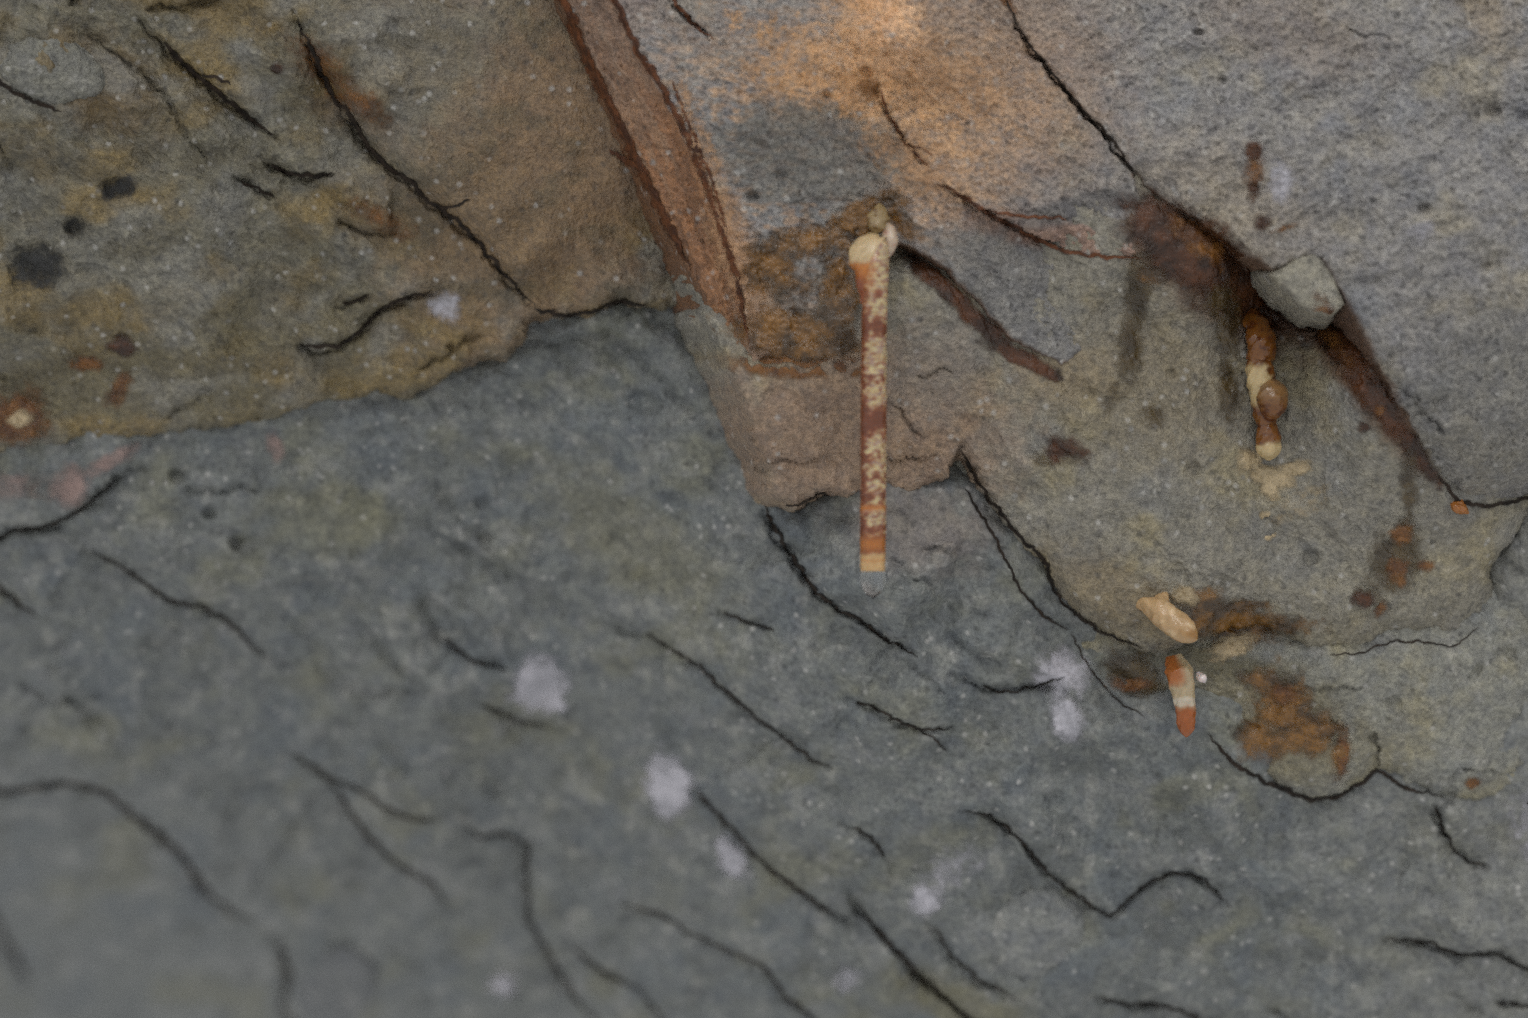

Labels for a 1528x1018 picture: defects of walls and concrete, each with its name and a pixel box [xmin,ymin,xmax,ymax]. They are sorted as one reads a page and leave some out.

crack [1006,0,1134,174]
crack [879,89,1143,260]
crack [299,291,433,349]
damp [1110,263,1164,399]
damp [1207,286,1241,420]
damp [1238,450,1310,540]
damp [1173,587,1305,660]